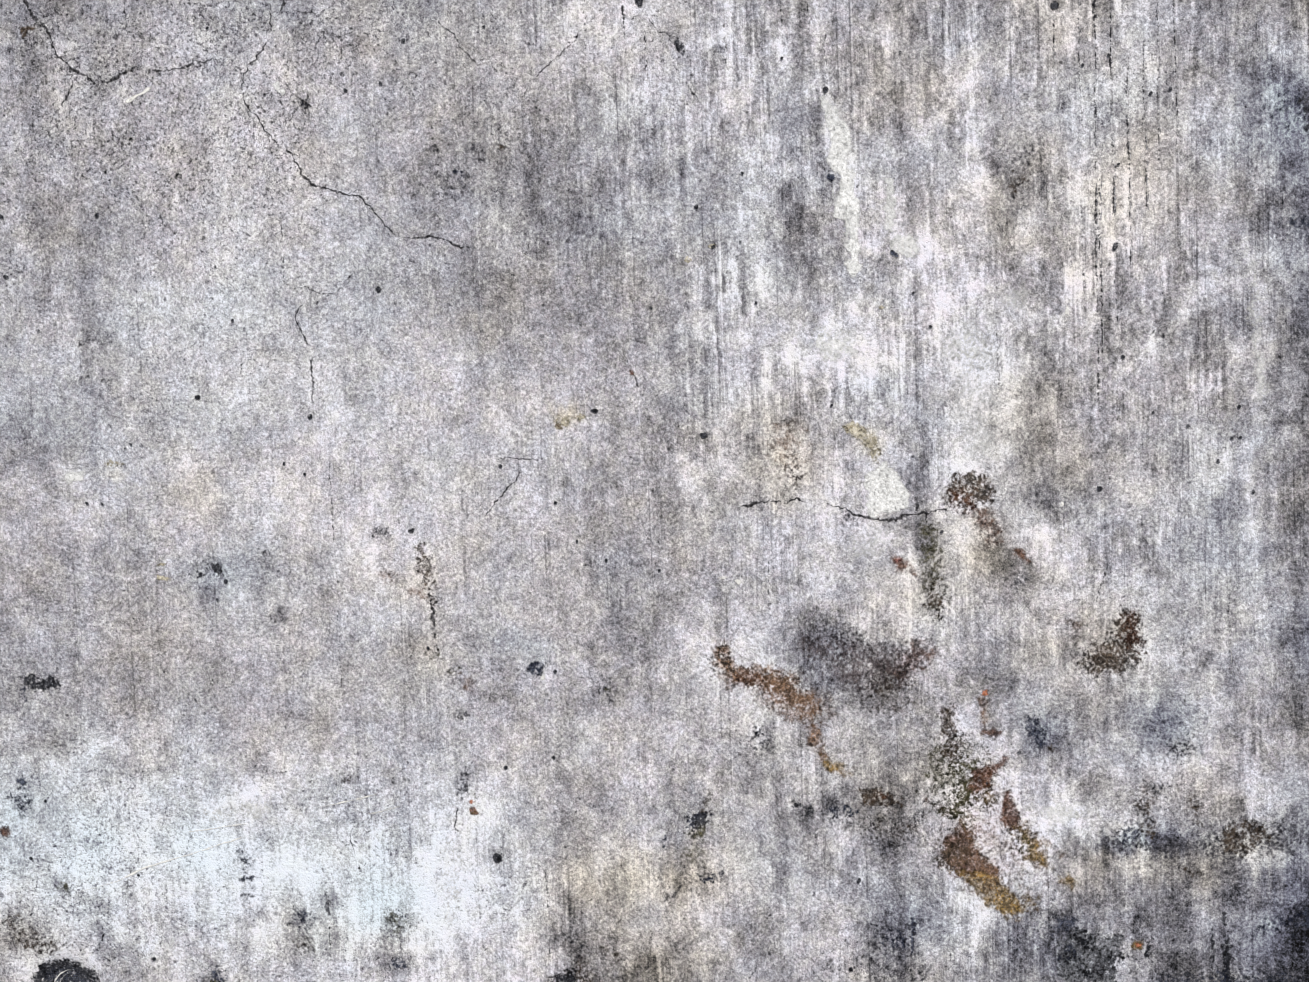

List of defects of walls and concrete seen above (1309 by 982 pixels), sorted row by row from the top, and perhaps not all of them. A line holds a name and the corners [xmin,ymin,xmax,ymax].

crack [23,0,210,107]
crack [241,0,468,249]
corrosion [709,645,851,776]
corrosion [874,639,938,694]
corrosion [1077,605,1147,678]
corrosion [859,698,1050,920]